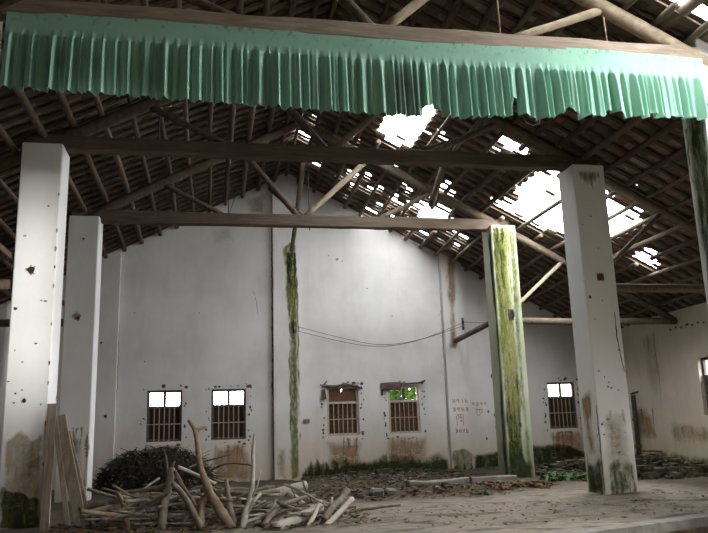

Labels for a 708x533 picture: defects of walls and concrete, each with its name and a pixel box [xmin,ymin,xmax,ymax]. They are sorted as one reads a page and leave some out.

crack [614,312,625,371]
damp [6,433,41,505]
damp [331,438,358,465]
damp [391,441,423,462]